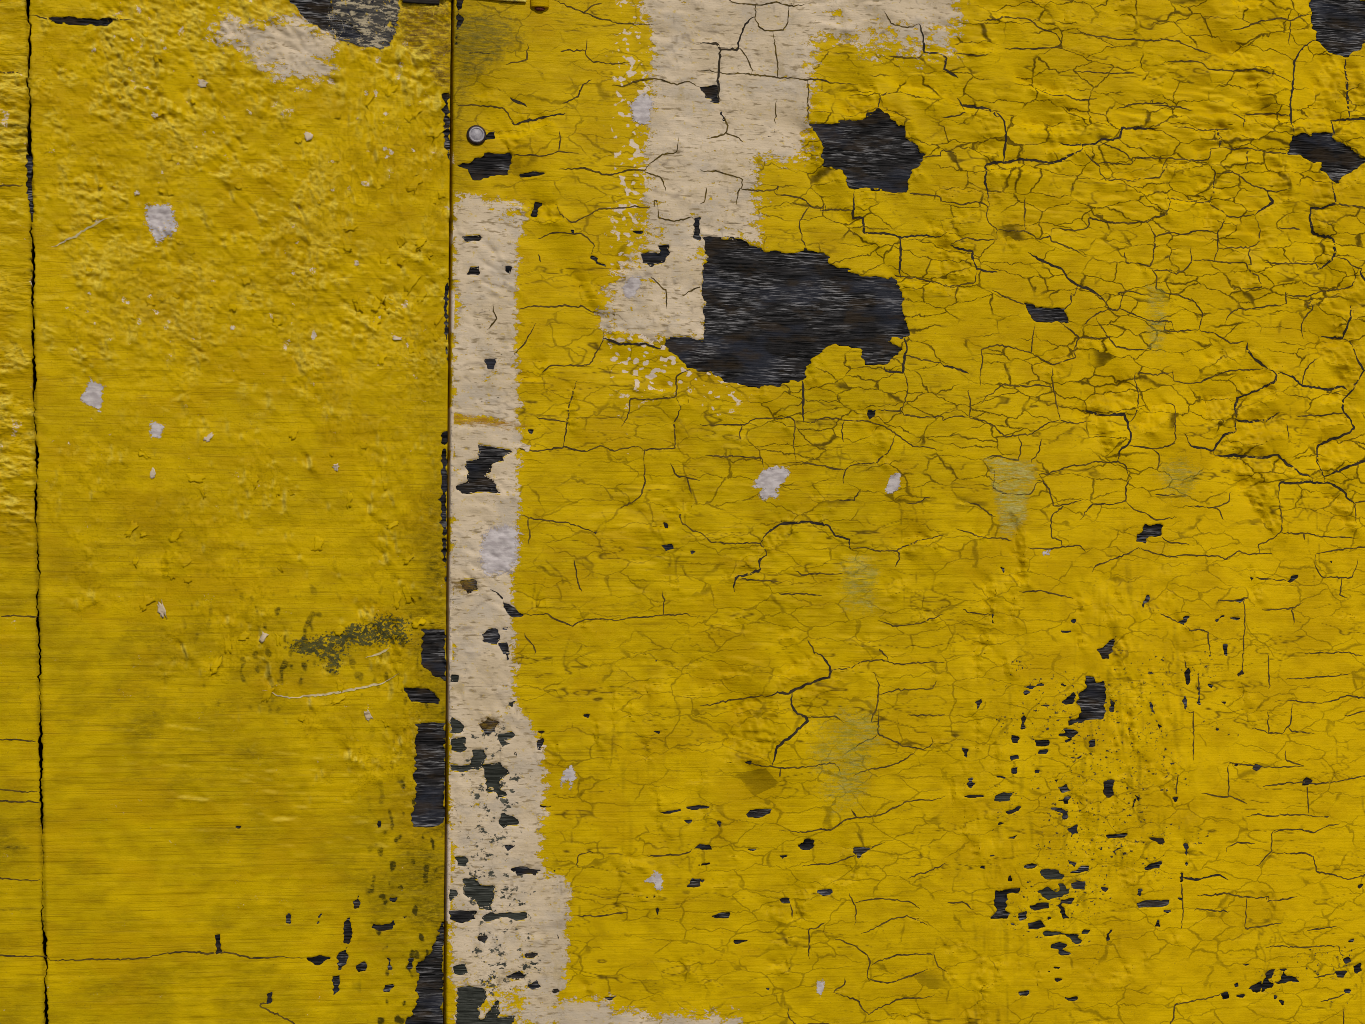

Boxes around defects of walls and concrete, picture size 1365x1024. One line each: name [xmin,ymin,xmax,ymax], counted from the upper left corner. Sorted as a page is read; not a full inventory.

peeling [202,0,400,92]
corrosion [403,3,451,86]
peeling [1309,0,1365,57]
peeling [590,0,969,388]
peeling [1288,133,1365,183]
crack [459,1,1365,1024]
peeling [383,93,743,1024]
crack [1,612,38,620]
crack [0,789,40,803]
peeling [964,676,1115,839]
crack [0,951,308,961]
crack [259,1002,295,1024]